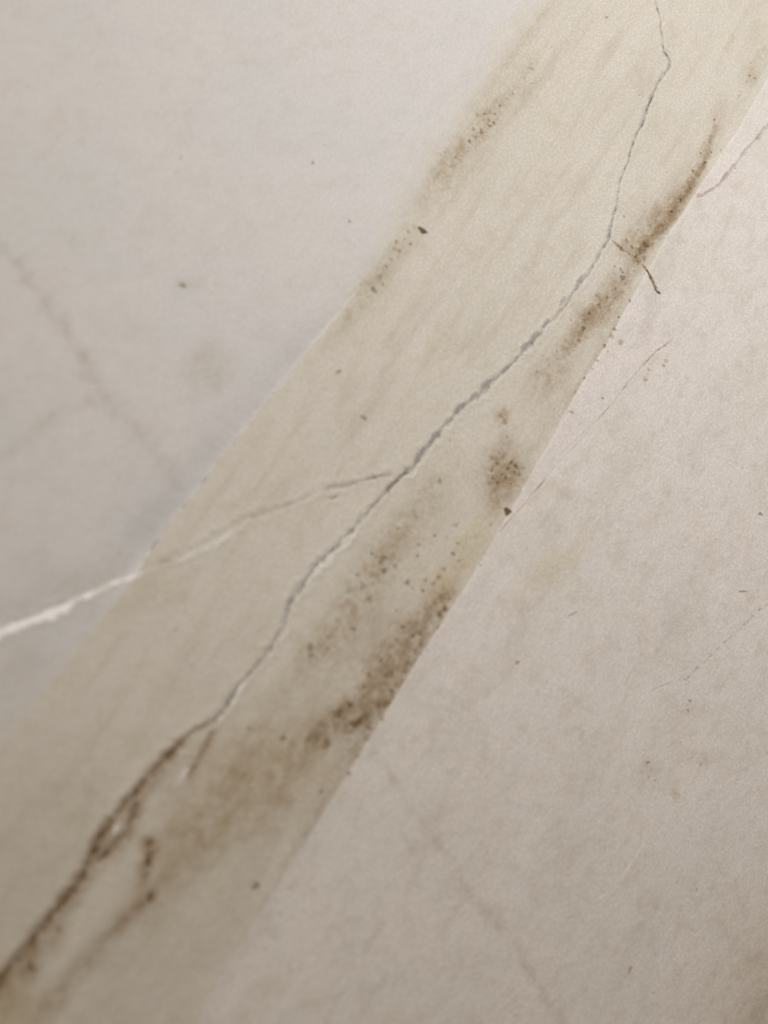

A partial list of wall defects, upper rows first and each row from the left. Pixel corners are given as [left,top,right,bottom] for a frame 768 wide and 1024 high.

crack [377,321,548,502]
crack [0,549,154,636]
crack [178,531,236,563]
crack [285,529,358,608]
crack [228,663,257,706]
crack [111,823,121,835]